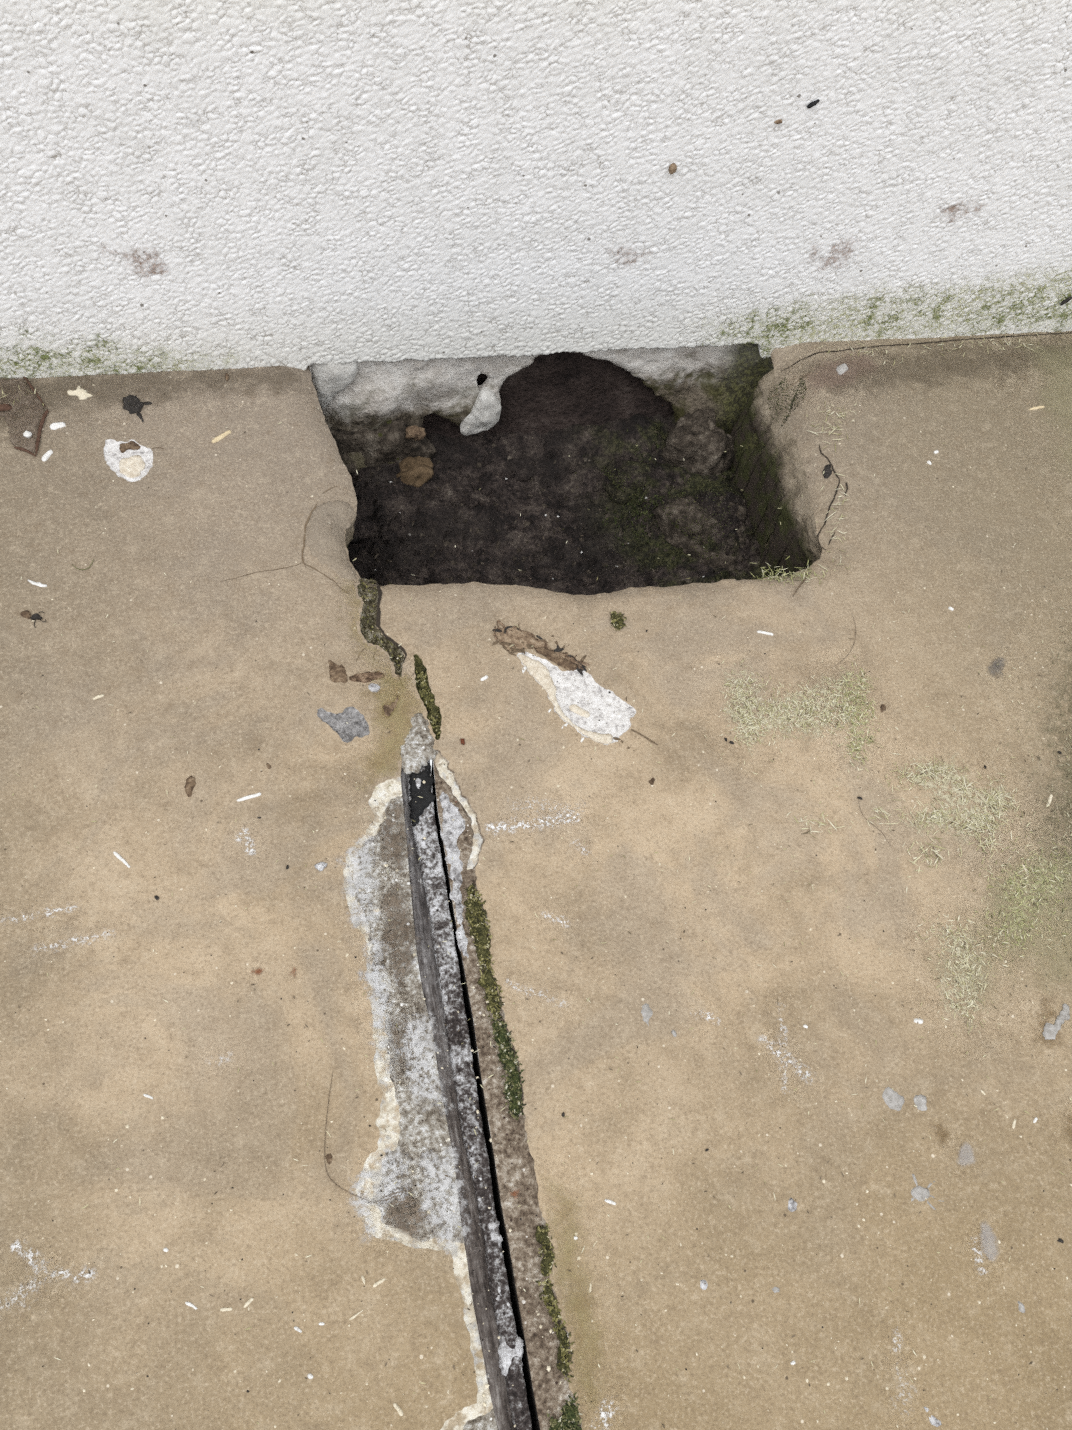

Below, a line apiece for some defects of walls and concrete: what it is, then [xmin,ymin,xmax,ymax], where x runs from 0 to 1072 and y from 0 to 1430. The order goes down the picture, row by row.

peeling [311,359,358,413]
peeling [460,387,502,436]
spalling [729,369,822,577]
crack [221,486,442,740]
spalling [317,707,370,743]
spalling [343,775,498,1430]
spalling [433,750,582,1430]